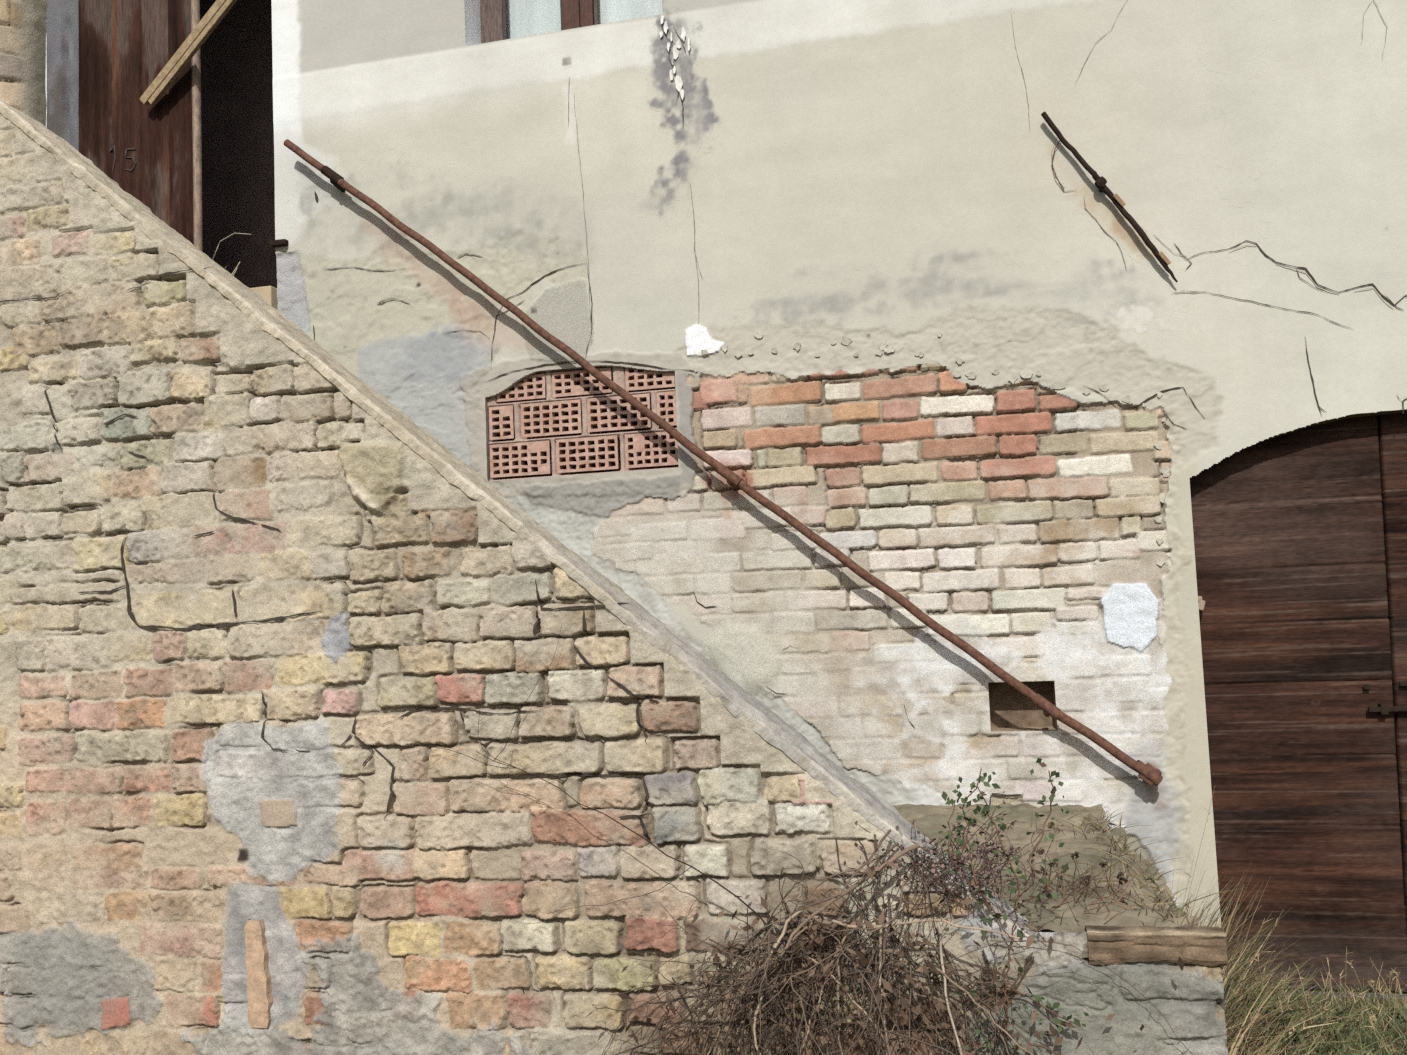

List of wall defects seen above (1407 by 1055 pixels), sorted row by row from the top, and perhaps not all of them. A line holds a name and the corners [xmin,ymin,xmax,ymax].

rust [358,205,552,356]
leakage [631,0,725,226]
rust [1041,138,1056,170]
rust [1065,176,1161,264]
crack [1174,240,1407,415]
rust [697,456,764,525]
spalling [592,324,1173,821]